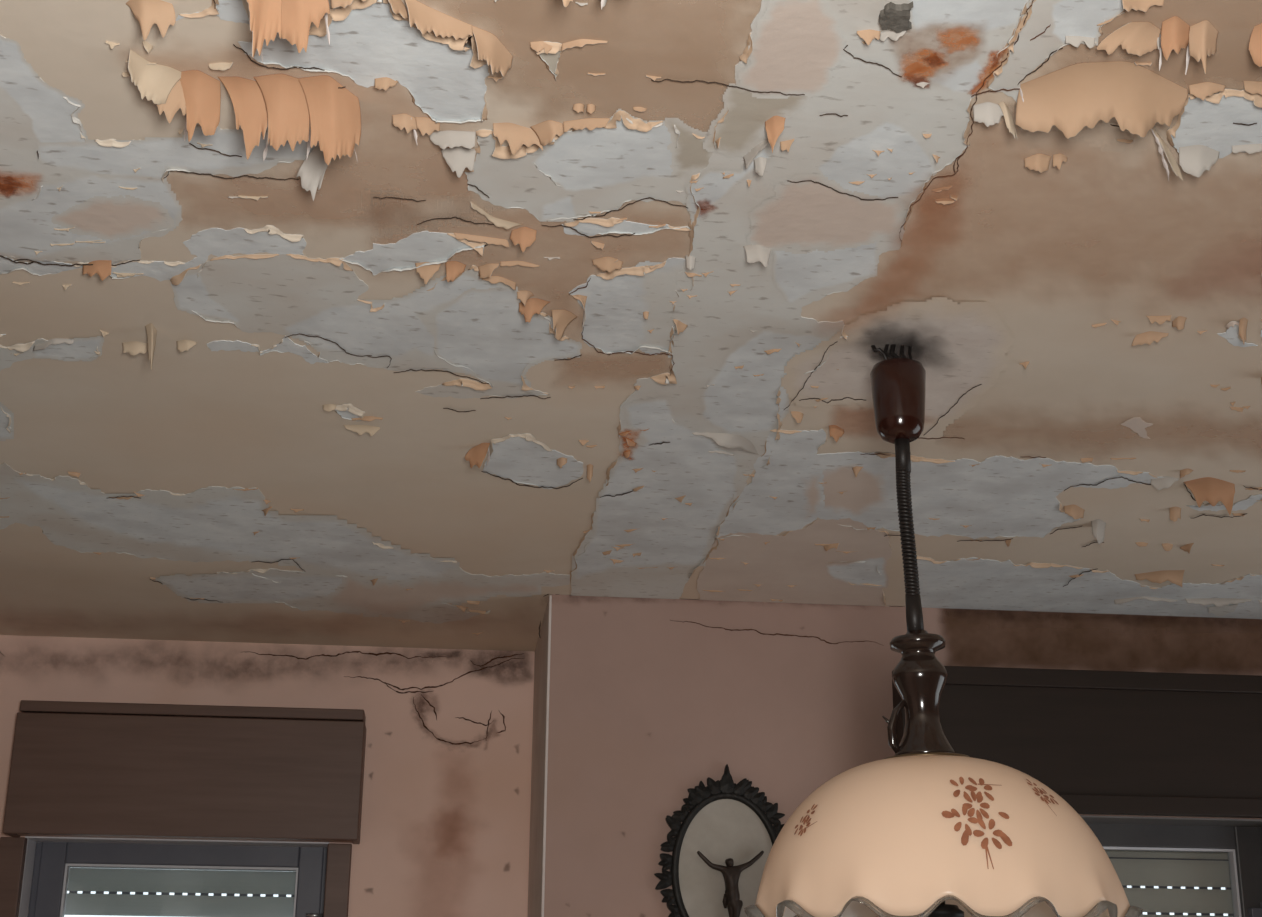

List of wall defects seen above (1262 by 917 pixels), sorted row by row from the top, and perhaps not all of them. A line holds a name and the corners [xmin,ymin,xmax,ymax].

corrosion [904,31,977,87]
corrosion [971,52,999,94]
corrosion [0,176,34,196]
peeling [0,0,1262,624]
crack [671,620,884,646]
crack [253,594,559,745]